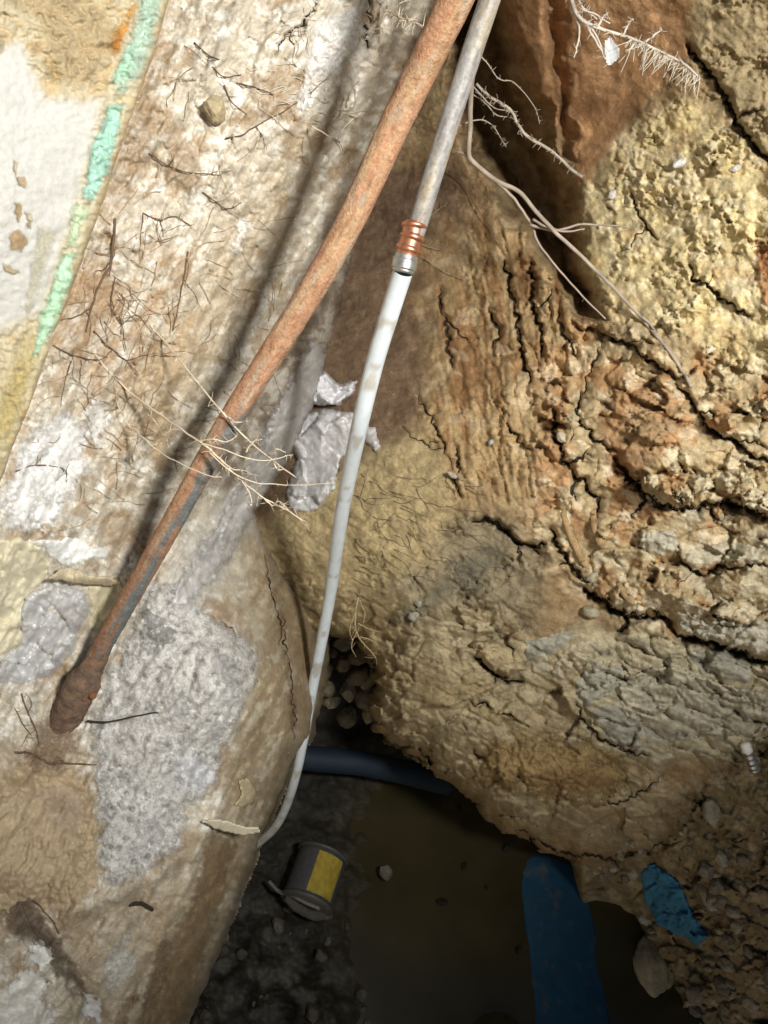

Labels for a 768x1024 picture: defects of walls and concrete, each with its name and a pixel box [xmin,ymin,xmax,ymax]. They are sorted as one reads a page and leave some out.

efflorescence [0,395,113,536]
spalling [90,581,260,885]
crack [264,555,298,740]